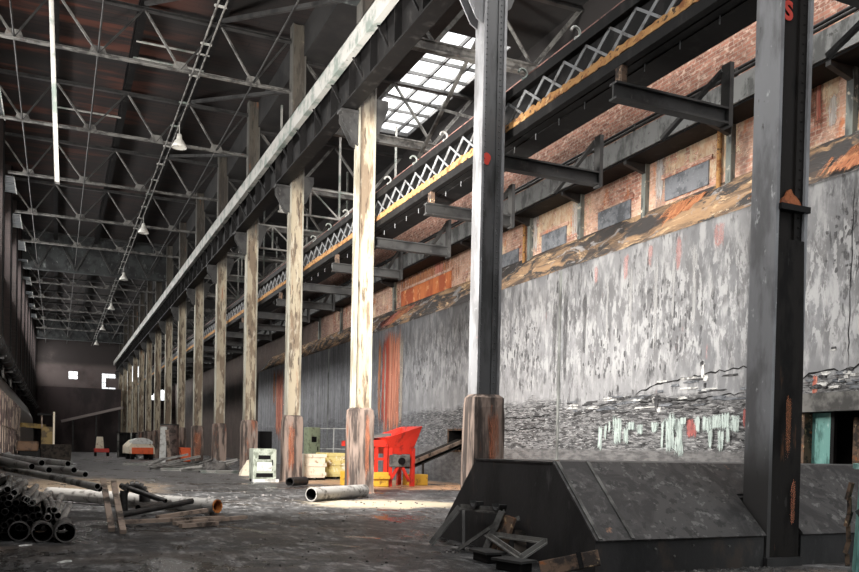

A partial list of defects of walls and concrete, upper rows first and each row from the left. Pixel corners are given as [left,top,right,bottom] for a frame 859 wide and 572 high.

corrosion [820,143,859,175]
corrosion [659,192,706,227]
corrosion [398,259,459,298]
corrosion [365,302,419,474]
spalling [805,366,859,389]
peeling [567,361,746,456]